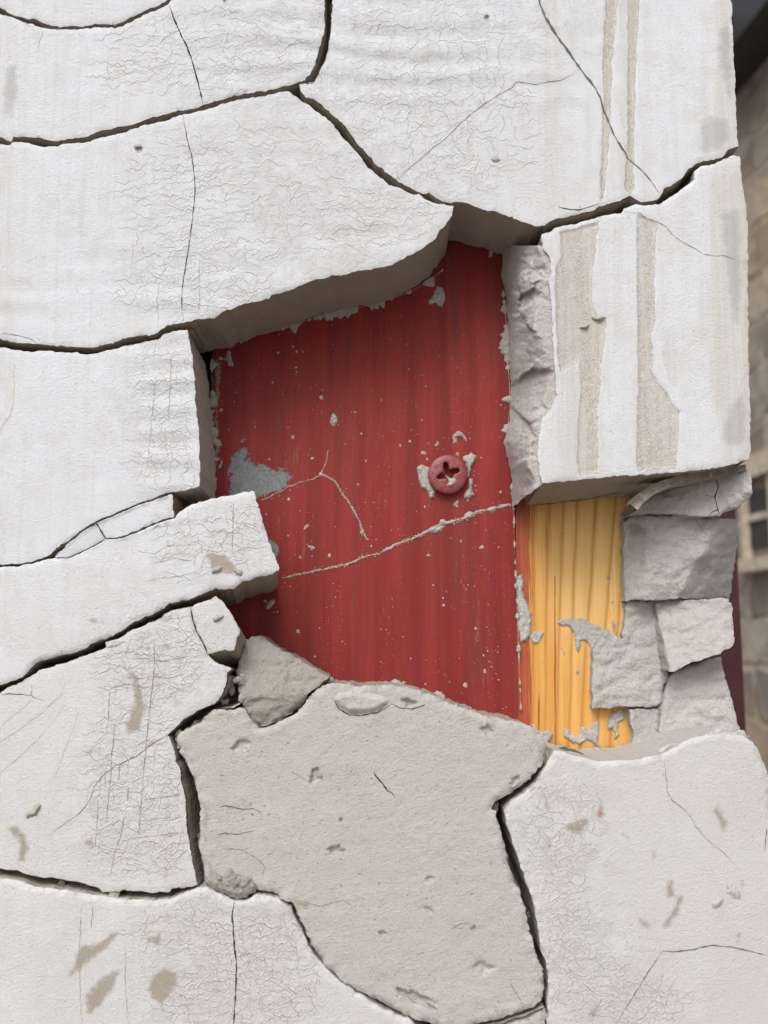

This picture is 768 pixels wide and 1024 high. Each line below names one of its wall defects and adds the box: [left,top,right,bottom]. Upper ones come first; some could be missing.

peeling [600,0,639,200]
peeling [214,360,293,500]
crack [0,0,746,581]
spalling [501,222,606,507]
spalling [589,215,753,753]
crack [0,590,424,1024]
spalling [230,738,252,753]
crack [474,746,768,1024]
crack [653,599,700,672]